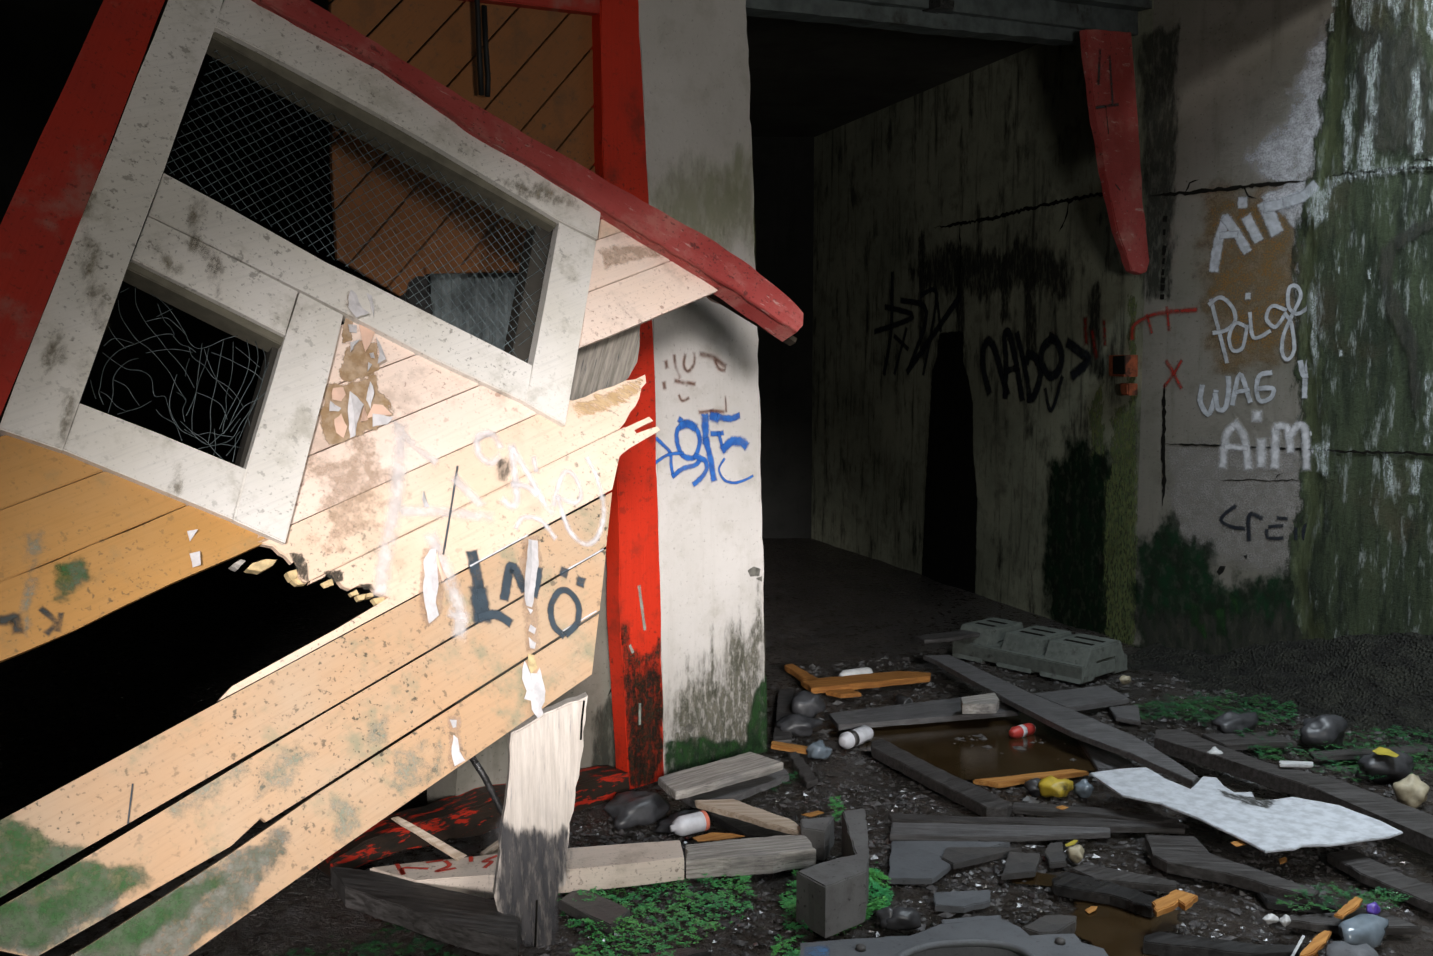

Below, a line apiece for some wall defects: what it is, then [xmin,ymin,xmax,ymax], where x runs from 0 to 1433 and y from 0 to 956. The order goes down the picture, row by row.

water stain [1247,0,1433,242]
crack [1151,158,1433,300]
water stain [1295,287,1317,357]
water stain [1104,377,1302,655]
crack [1161,387,1433,506]